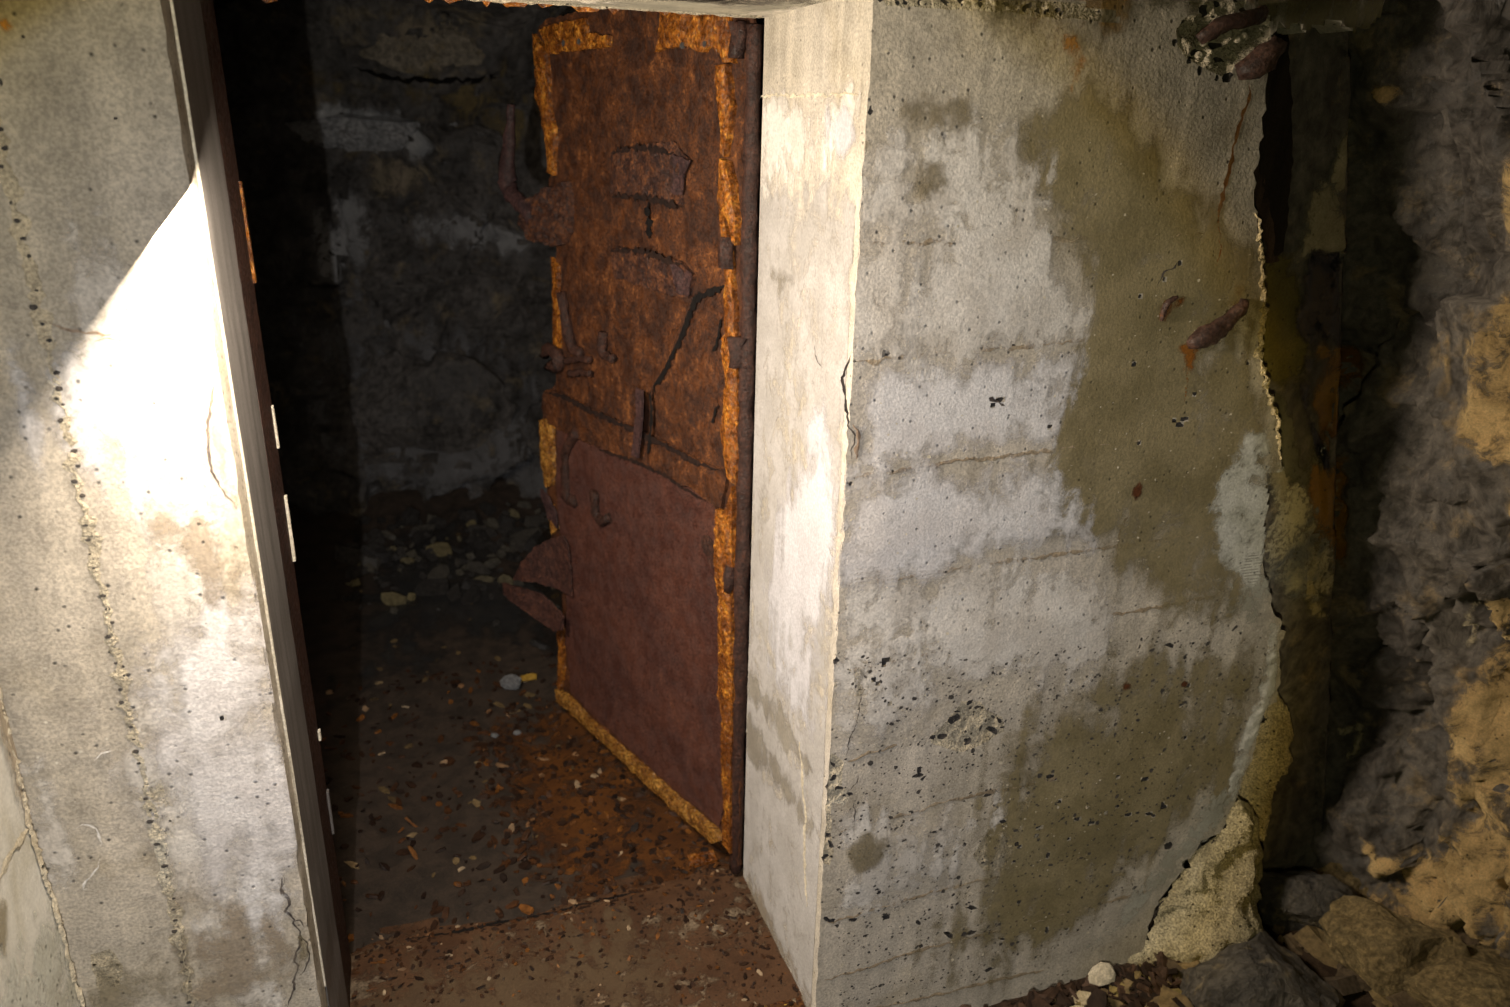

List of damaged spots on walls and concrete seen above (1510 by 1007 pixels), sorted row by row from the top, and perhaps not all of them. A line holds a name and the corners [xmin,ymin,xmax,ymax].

spalling [1172,0,1288,83]
leakage [1371,86,1398,103]
leakage [1502,164,1510,233]
spalling [1186,213,1282,460]
leakage [1455,297,1510,465]
corrosion [701,534,714,569]
leakage [743,81,1364,1006]
spalling [1238,691,1294,841]
leakage [1362,598,1510,949]